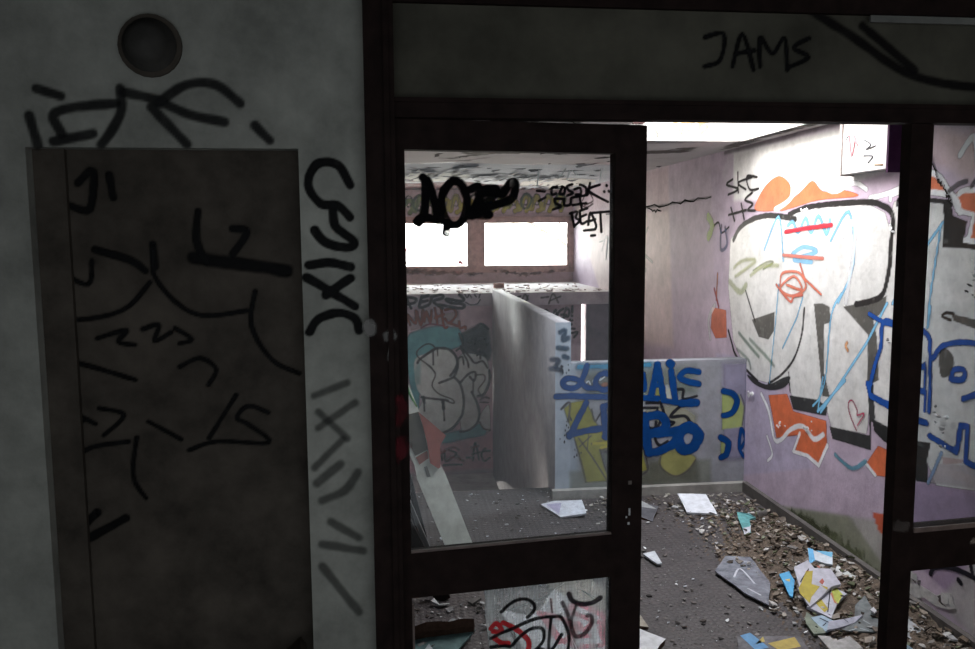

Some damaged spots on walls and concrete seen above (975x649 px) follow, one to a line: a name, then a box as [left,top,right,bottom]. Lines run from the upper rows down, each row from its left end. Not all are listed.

peeling [405,153,610,191]